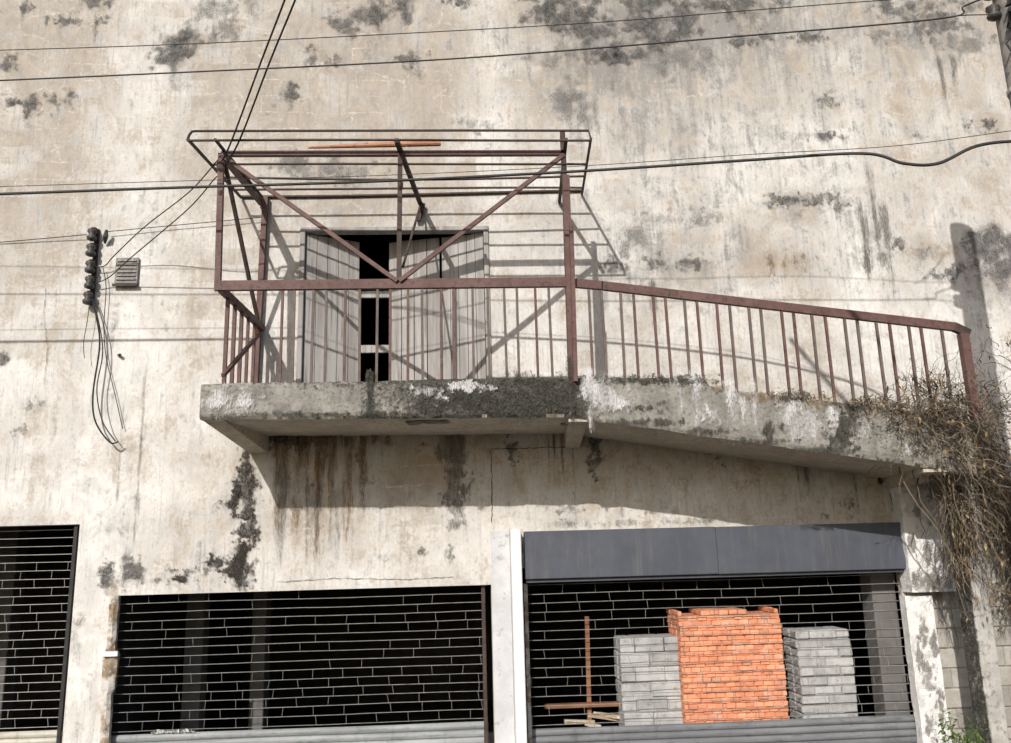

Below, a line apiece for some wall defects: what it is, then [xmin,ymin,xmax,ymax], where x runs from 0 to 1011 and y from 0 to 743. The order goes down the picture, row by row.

mould [149,0,238,70]
mould [519,0,791,75]
mould [787,32,828,43]
damp [864,0,982,99]
mould [551,76,596,129]
damp [768,191,904,278]
damp [923,223,1011,289]
damp [97,450,262,591]
damp [269,435,389,552]
damp [420,435,474,526]